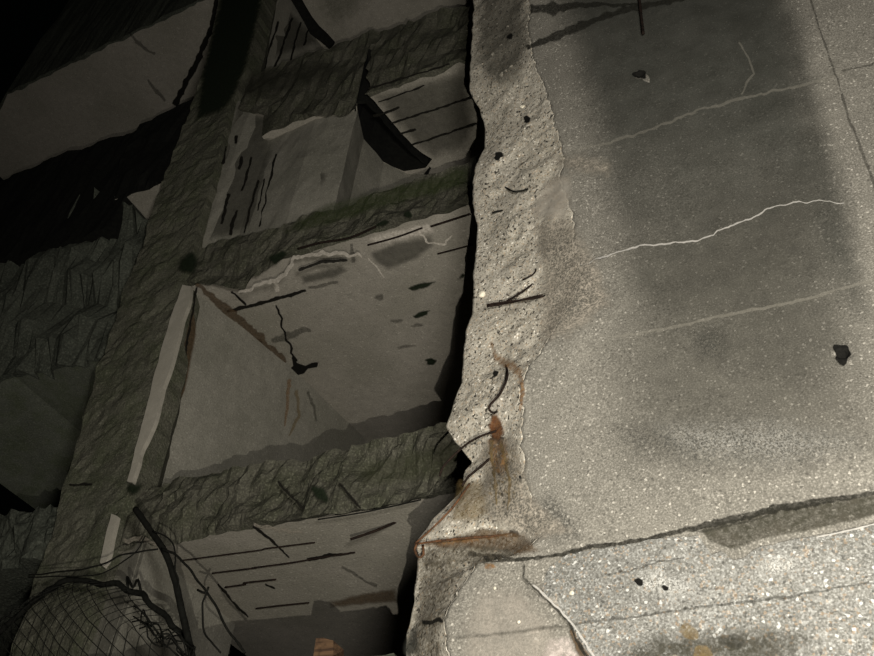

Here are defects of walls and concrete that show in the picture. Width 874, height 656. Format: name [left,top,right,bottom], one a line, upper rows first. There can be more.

crack [526,0,684,50]
damp [575,0,806,177]
crack [580,200,843,265]
crack [231,289,306,361]
spalling [238,0,607,656]
corrosion [489,415,507,472]
spalling [225,579,276,588]
spalling [212,552,355,574]
crack [468,491,874,656]
crack [422,616,443,624]
damp [636,634,795,656]